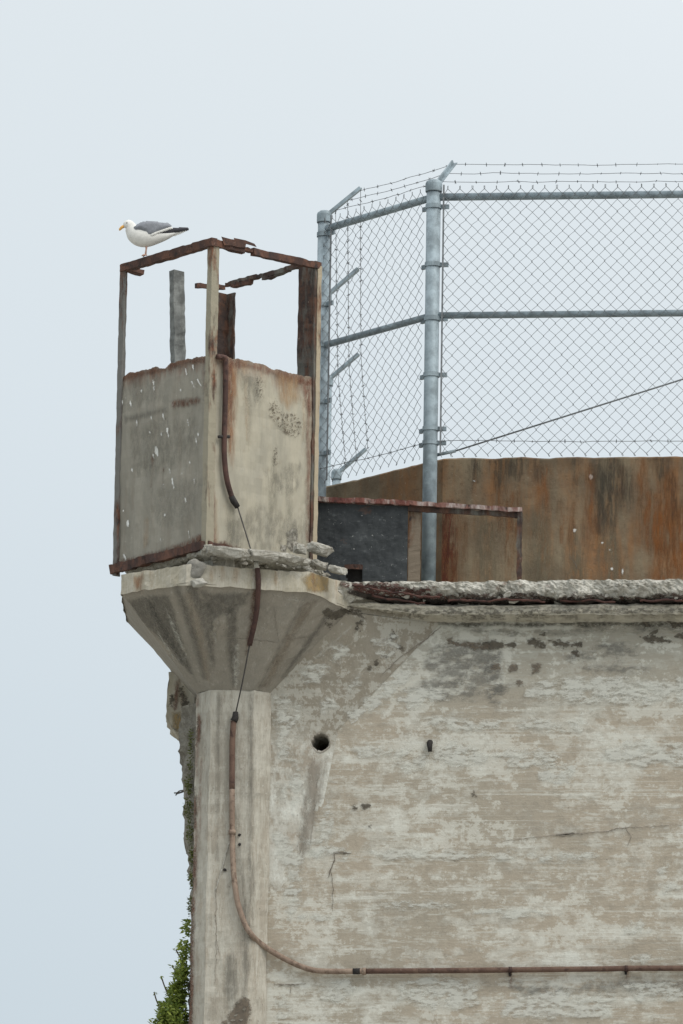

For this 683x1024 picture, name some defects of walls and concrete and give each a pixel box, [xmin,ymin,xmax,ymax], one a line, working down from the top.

peeling [204,528,312,571]
water stain [304,761,320,849]
crack [501,824,677,844]
crack [328,852,351,911]